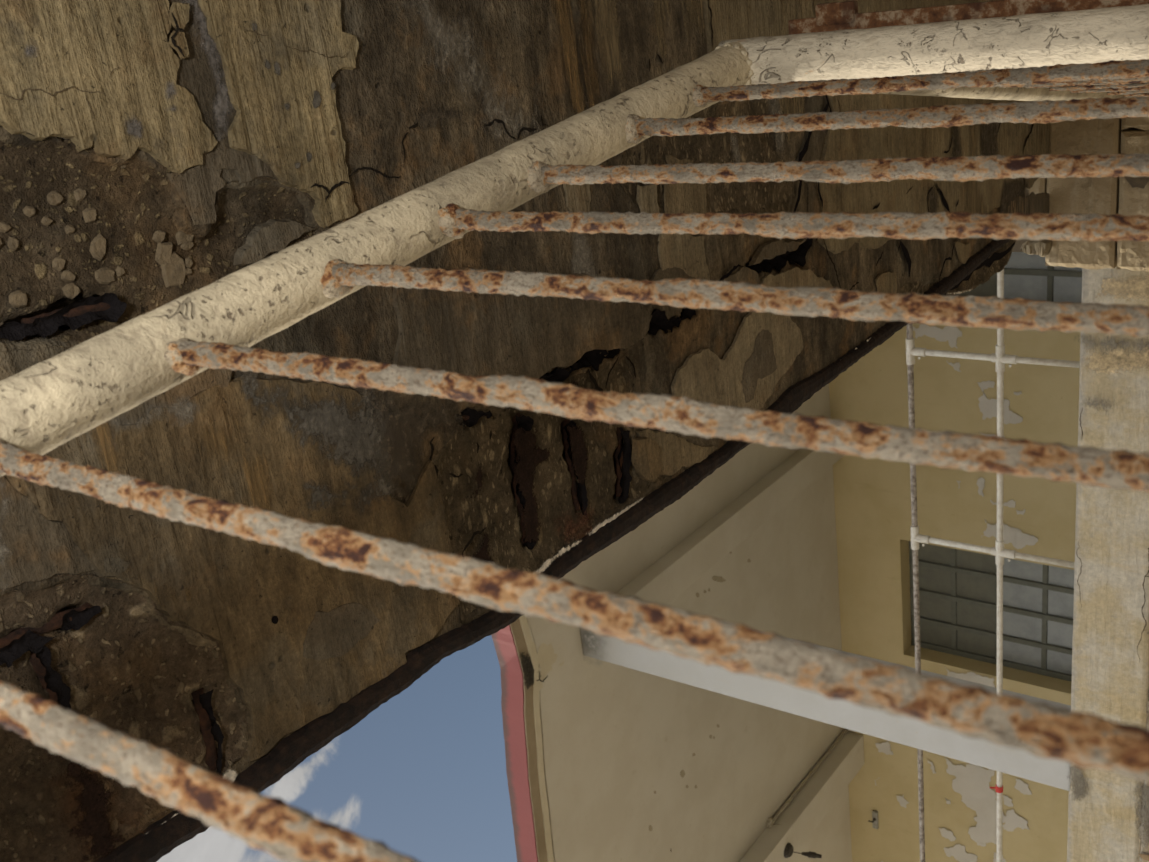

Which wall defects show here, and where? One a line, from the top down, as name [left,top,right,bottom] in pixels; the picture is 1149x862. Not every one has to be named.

spalling [0,0,359,352]
crack [311,122,418,203]
crack [484,115,547,140]
flaking render [618,177,1049,214]
flaking render [621,122,1050,166]
flaking render [392,287,696,394]
flaking render [671,311,804,410]
spalling [437,404,717,573]
corrosion [472,534,493,562]
spalling [0,476,248,776]
spalling [0,724,172,862]
corrosion [65,761,125,860]